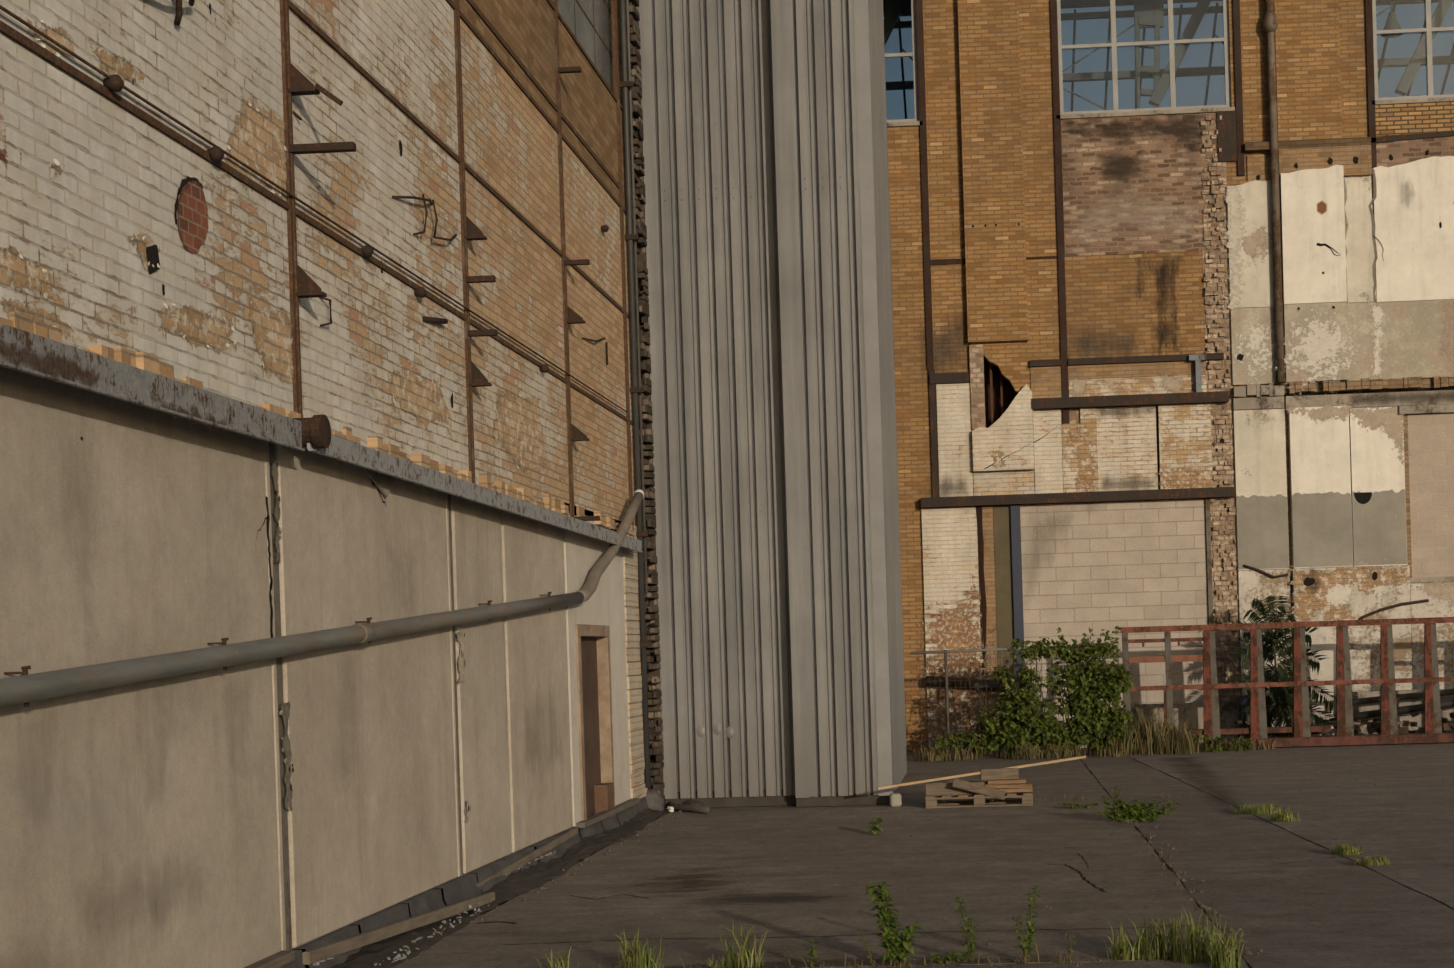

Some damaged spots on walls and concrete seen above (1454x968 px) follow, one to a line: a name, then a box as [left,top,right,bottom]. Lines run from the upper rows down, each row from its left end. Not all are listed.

peeling [20,17,74,58]
peeling [95,48,145,85]
peeling [48,158,65,179]
peeling [224,95,287,202]
flaking render [174,176,209,253]
peeling [0,246,74,340]
peeling [126,228,293,387]
rust [0,342,99,387]
spalling [969,341,1024,394]
spalling [1068,115,1410,728]
peeling [1289,562,1454,621]
peeling [914,565,1003,751]